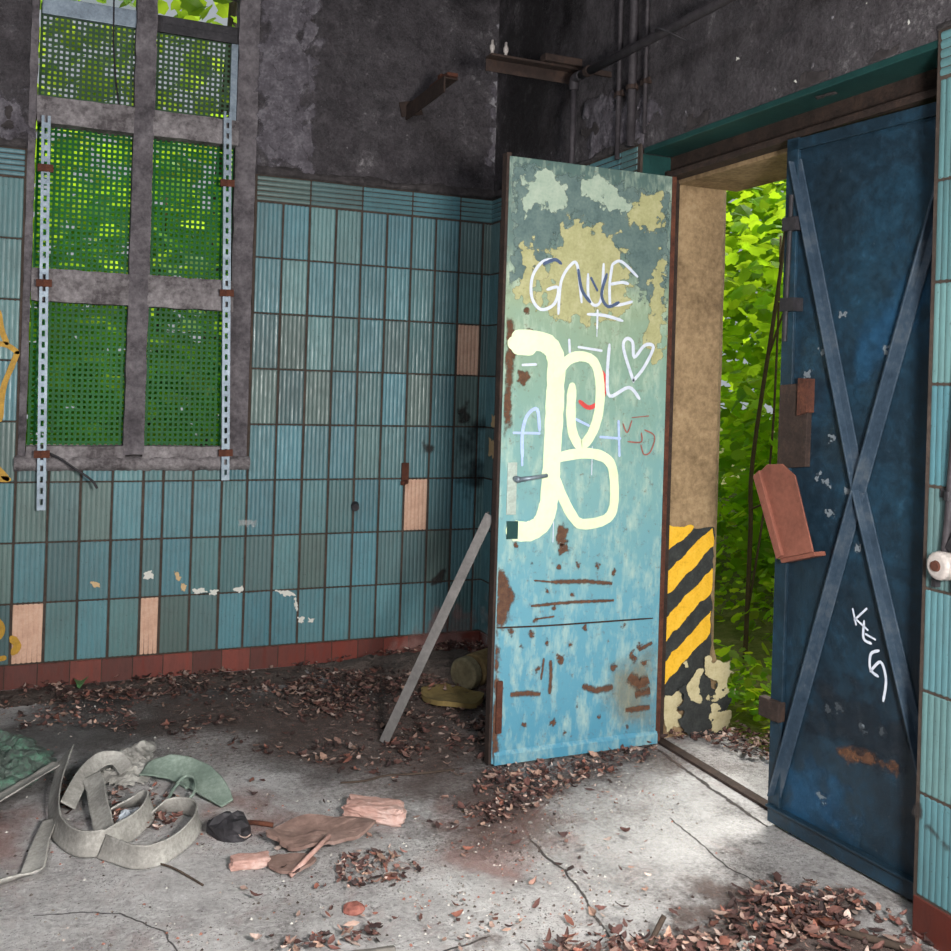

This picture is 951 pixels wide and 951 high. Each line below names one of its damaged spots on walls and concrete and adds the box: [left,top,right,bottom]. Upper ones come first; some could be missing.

spalling [581,89,662,159]
peeling [509,162,671,365]
spalling [174,571,219,595]
spalling [275,590,314,623]
rust [496,570,515,637]
rust [520,525,616,647]
rust [492,643,572,758]
rust [582,684,613,694]
rust [625,642,653,713]
peeling [664,655,736,738]
crack [33,912,178,951]
crack [444,936,490,951]